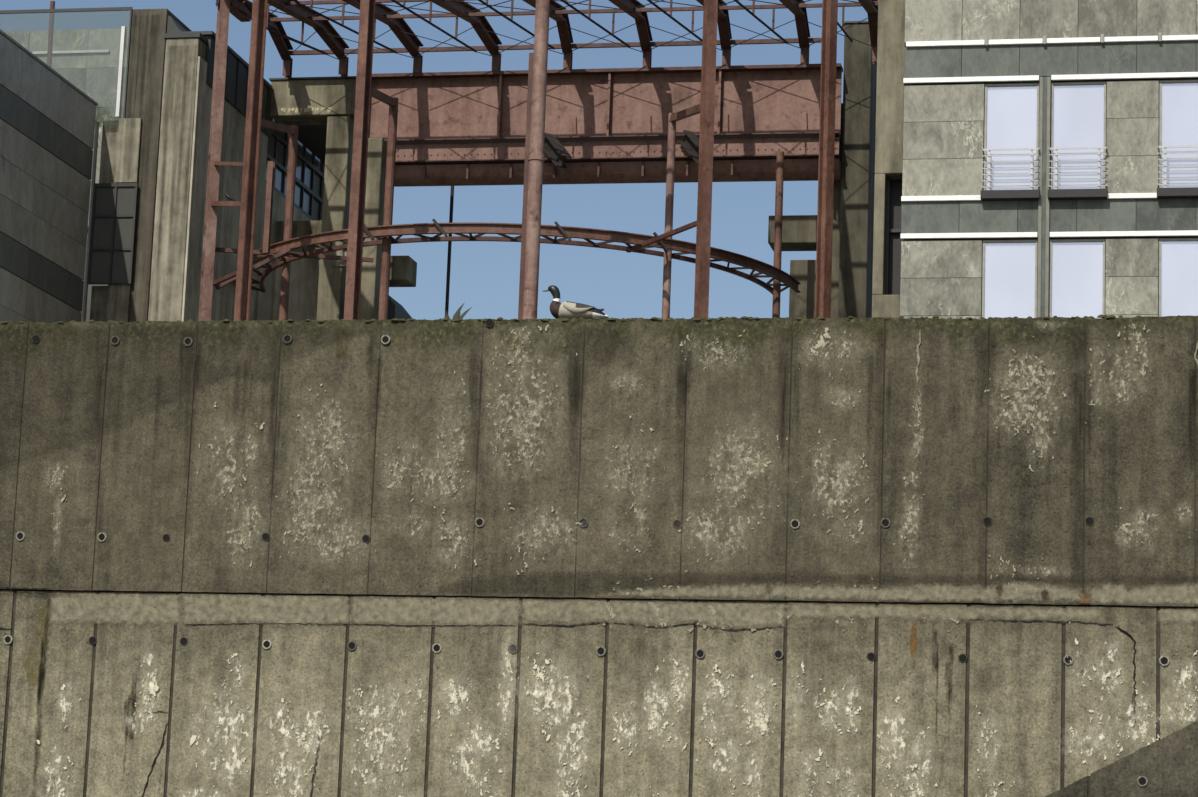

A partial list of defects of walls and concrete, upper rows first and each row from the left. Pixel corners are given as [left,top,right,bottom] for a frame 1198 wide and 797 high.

crack [957,618,1137,727]
crack [142,711,168,797]
crack [310,724,321,797]